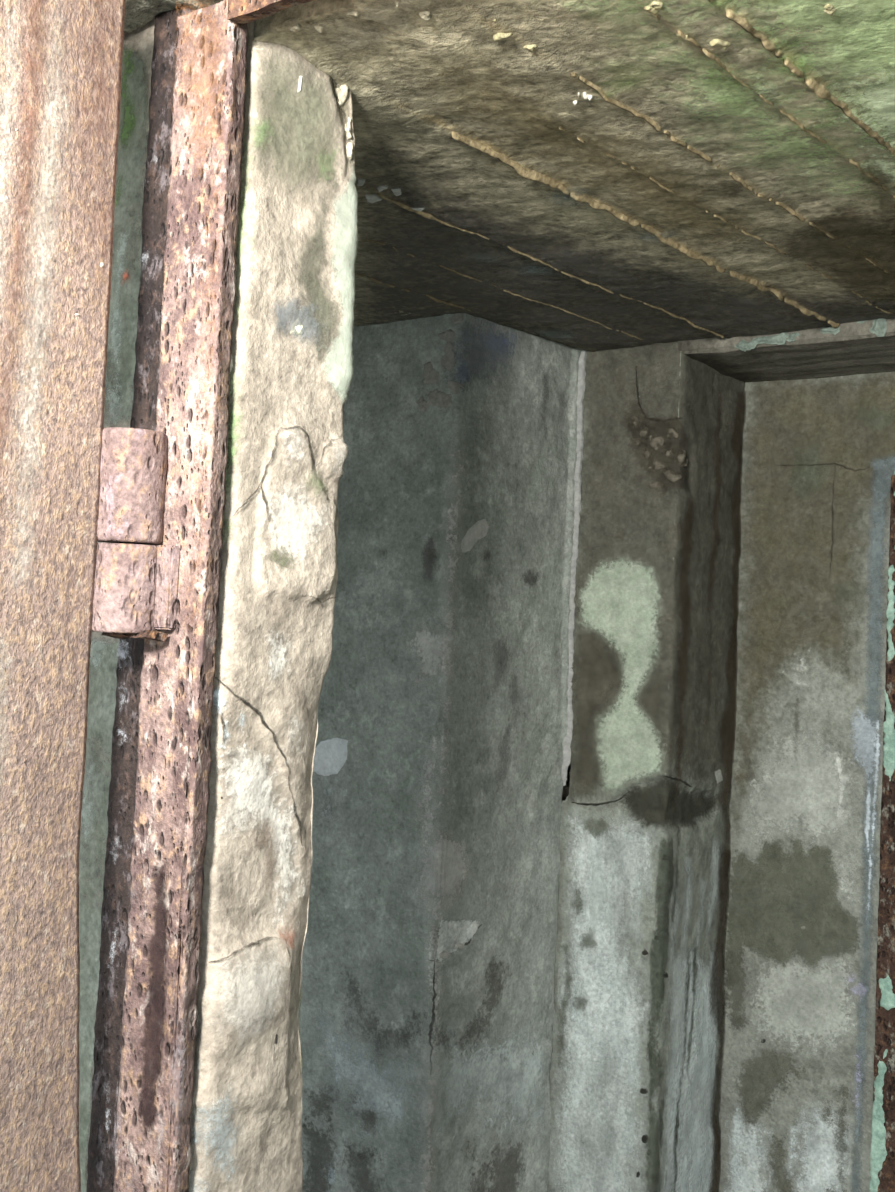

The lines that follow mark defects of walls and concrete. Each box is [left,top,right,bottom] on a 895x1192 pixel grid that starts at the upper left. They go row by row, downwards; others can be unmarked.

crack [233,425,336,516]
crack [217,679,302,844]
damp [354,149,895,1192]
peeling [849,457,895,1192]
damp [303,974,421,1192]